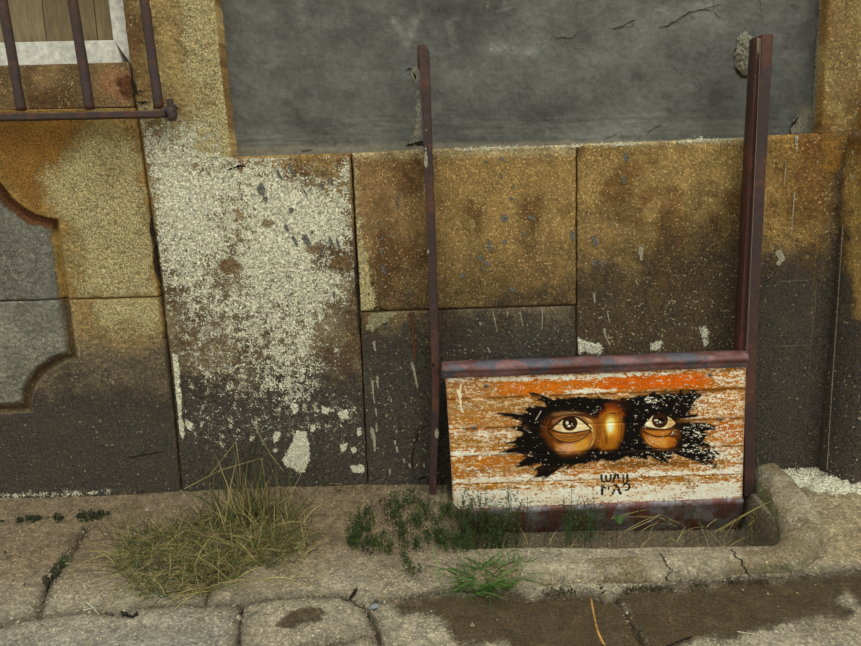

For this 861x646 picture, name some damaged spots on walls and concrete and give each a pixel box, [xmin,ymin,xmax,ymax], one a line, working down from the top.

crack [657,2,725,29]
peeling [33,0,397,473]
leakage [0,211,740,499]
leakage [755,222,861,496]